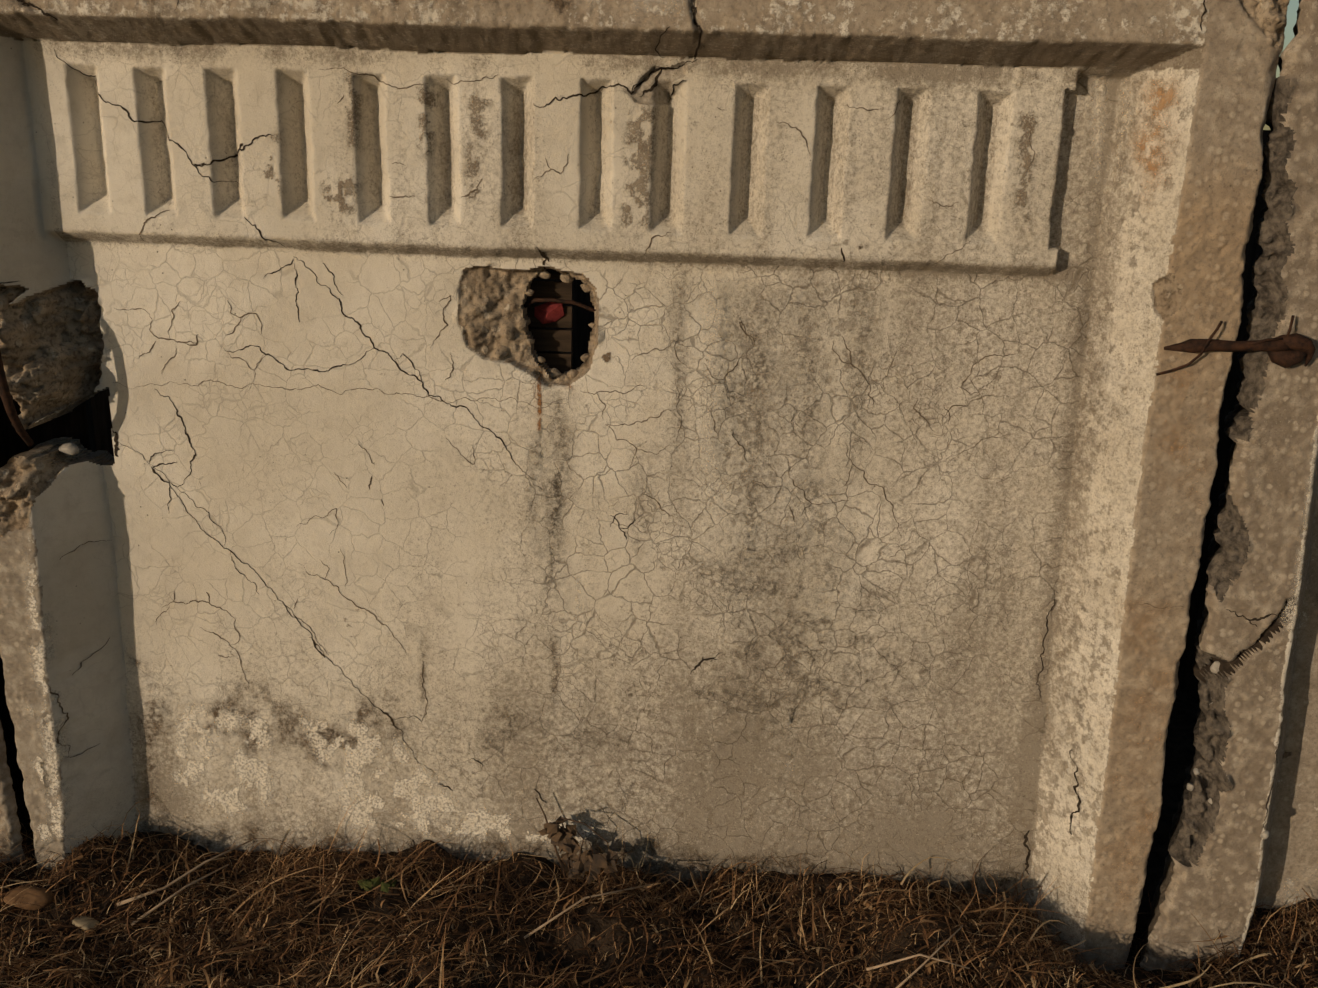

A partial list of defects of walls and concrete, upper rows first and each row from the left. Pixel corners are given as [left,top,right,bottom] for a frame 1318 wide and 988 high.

crack [56,56,273,183]
crack [319,67,497,104]
crack [534,0,702,108]
spalling [1239,0,1290,50]
spalling [458,266,610,387]
spalling [0,280,109,537]
crack [113,217,909,790]
damp [550,402,567,548]
crack [1192,597,1297,683]
damp [205,690,394,761]
crack [1069,750,1081,835]
crack [1023,830,1031,874]